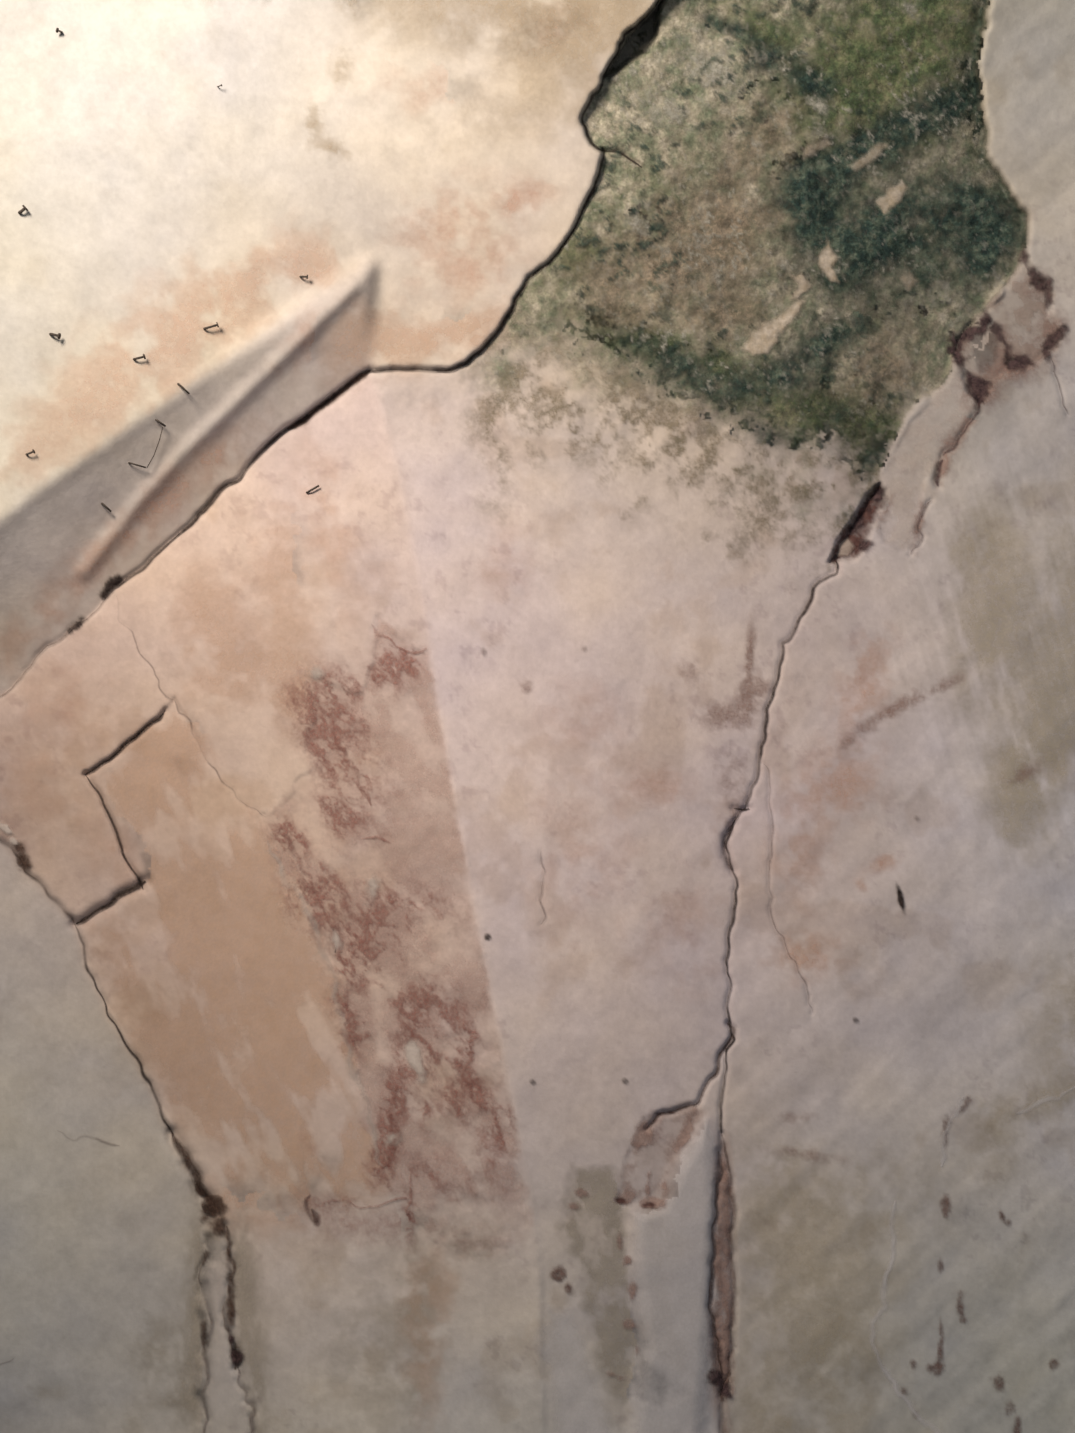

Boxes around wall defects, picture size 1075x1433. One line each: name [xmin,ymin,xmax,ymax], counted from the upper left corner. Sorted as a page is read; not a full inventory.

spalling [606,0,662,75]
damp [471,0,1026,496]
spalling [934,253,1068,486]
crack [0,824,31,869]
crack [86,966,152,1086]
crack [76,711,165,924]
peeling [275,625,509,1180]
crack [649,561,838,1399]
crack [163,1119,260,1430]
spalling [616,1173,667,1208]
spalling [674,1117,692,1152]
rust [912,1328,943,1374]